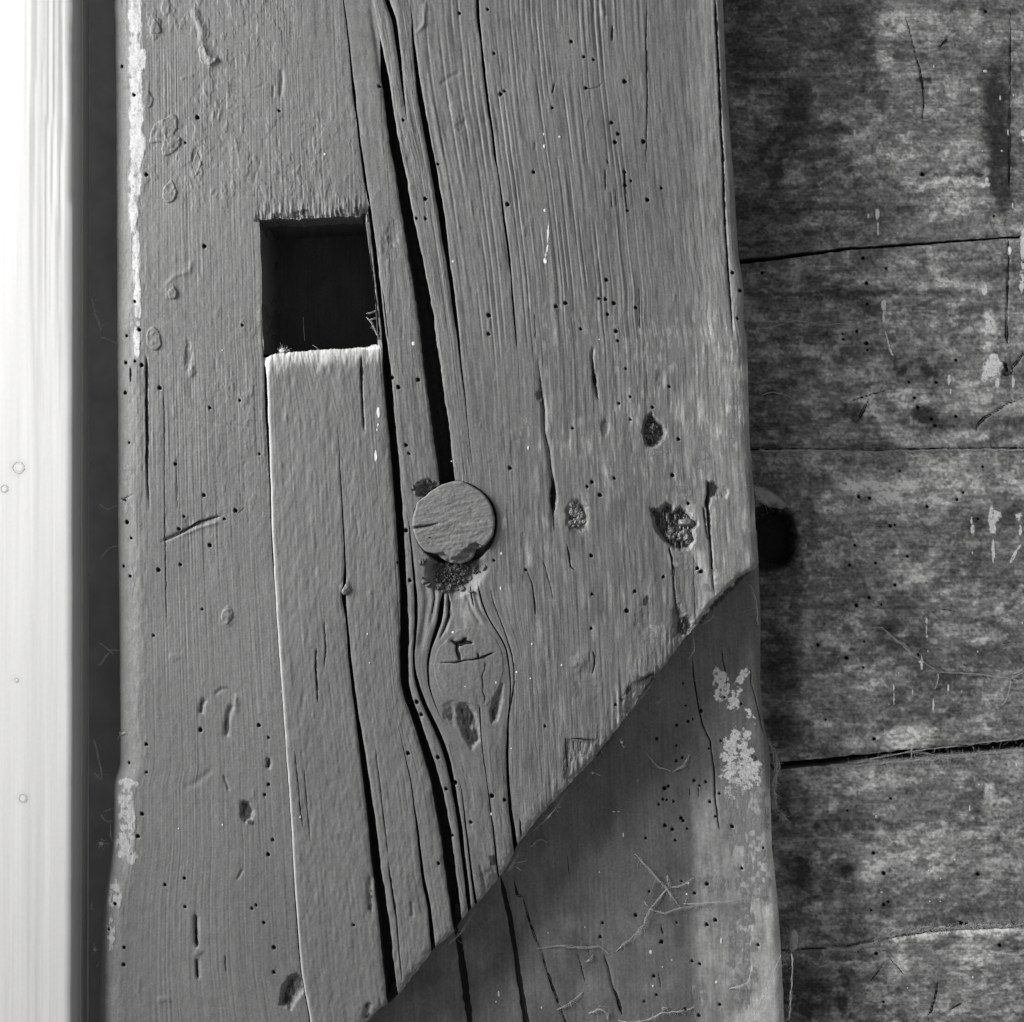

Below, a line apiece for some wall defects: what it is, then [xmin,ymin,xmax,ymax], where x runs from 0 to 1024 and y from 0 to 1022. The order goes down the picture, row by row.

crack [122,357,240,612]
crack [343,0,573,1022]
crack [577,946,622,1015]